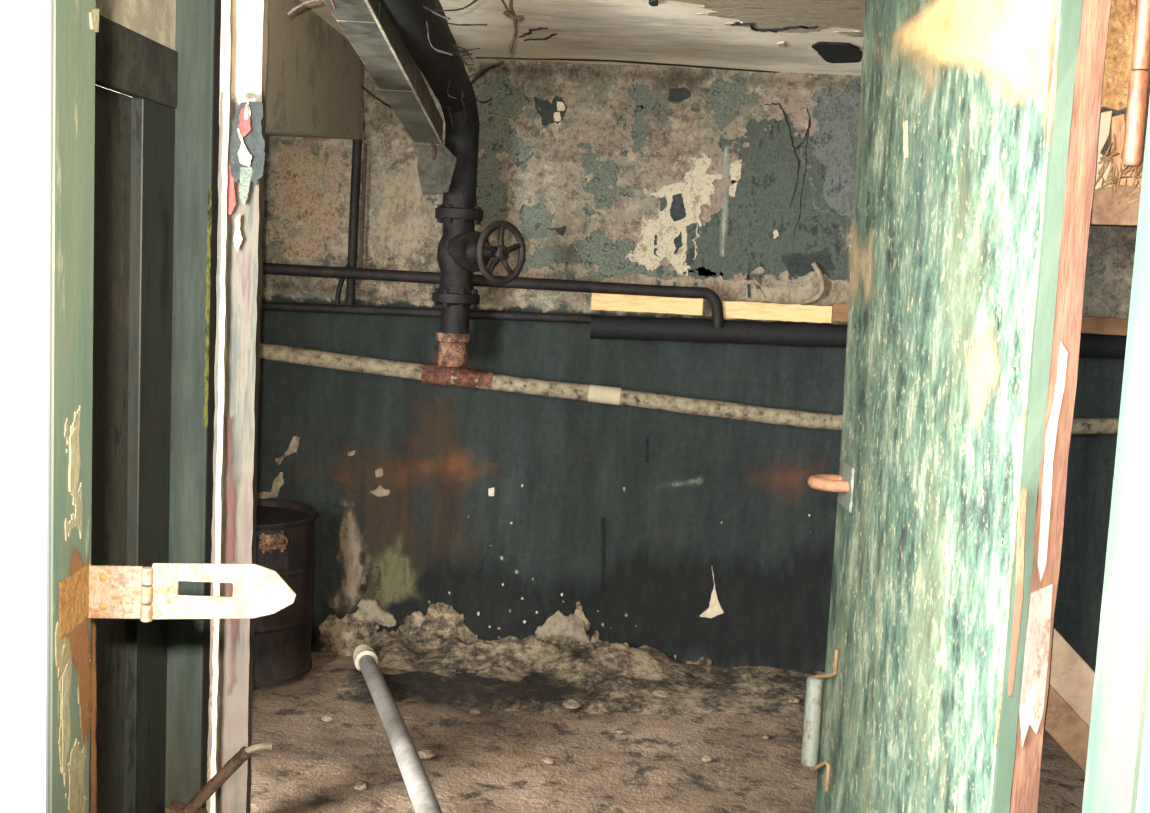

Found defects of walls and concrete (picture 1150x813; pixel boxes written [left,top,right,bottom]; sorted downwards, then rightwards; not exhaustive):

spalling [227,101,344,259]
peeling [471,0,865,305]
spalling [64,405,83,541]
spalling [55,622,97,813]